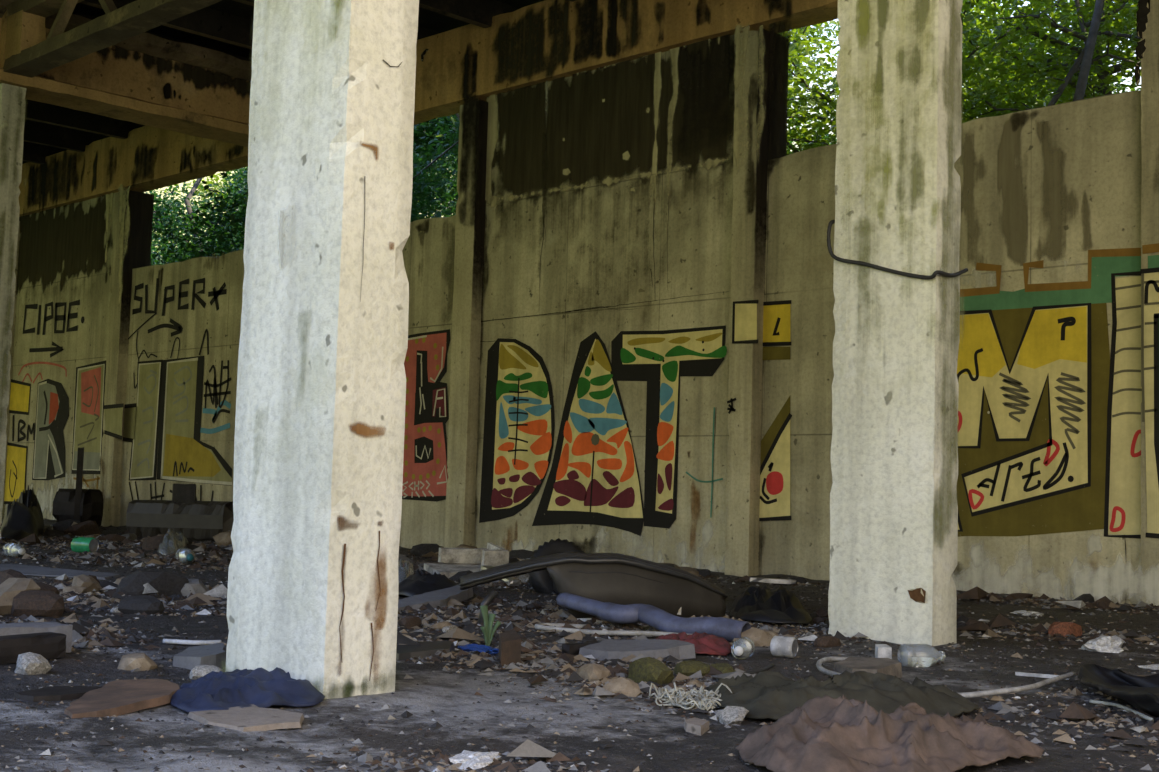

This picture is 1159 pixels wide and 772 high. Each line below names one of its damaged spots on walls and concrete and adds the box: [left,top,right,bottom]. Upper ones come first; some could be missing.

damp [443,0,638,362]
damp [641,3,690,200]
damp [706,21,791,217]
damp [857,0,888,108]
damp [882,138,921,204]
damp [915,0,929,31]
damp [933,0,1092,342]
corrosion [350,423,384,437]
damp [934,368,958,543]
corrosion [337,516,351,530]
corrosion [373,559,387,639]
damp [952,535,1159,606]